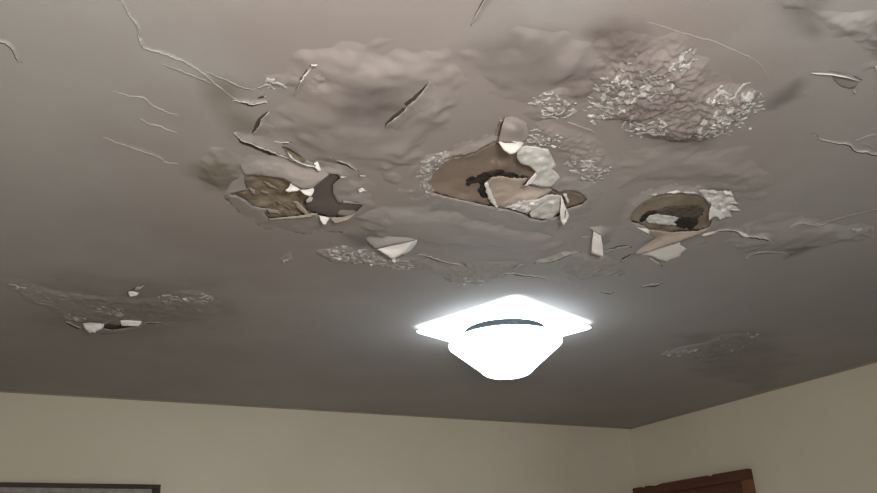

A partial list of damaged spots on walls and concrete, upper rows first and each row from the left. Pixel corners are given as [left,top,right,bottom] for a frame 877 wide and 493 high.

crack [470,0,493,26]
crack [0,39,22,63]
crack [103,0,359,172]
peeling [809,71,863,94]
crack [812,132,877,156]
flaking render [223,154,380,234]
flaking render [397,116,740,266]
flaking render [64,318,164,334]